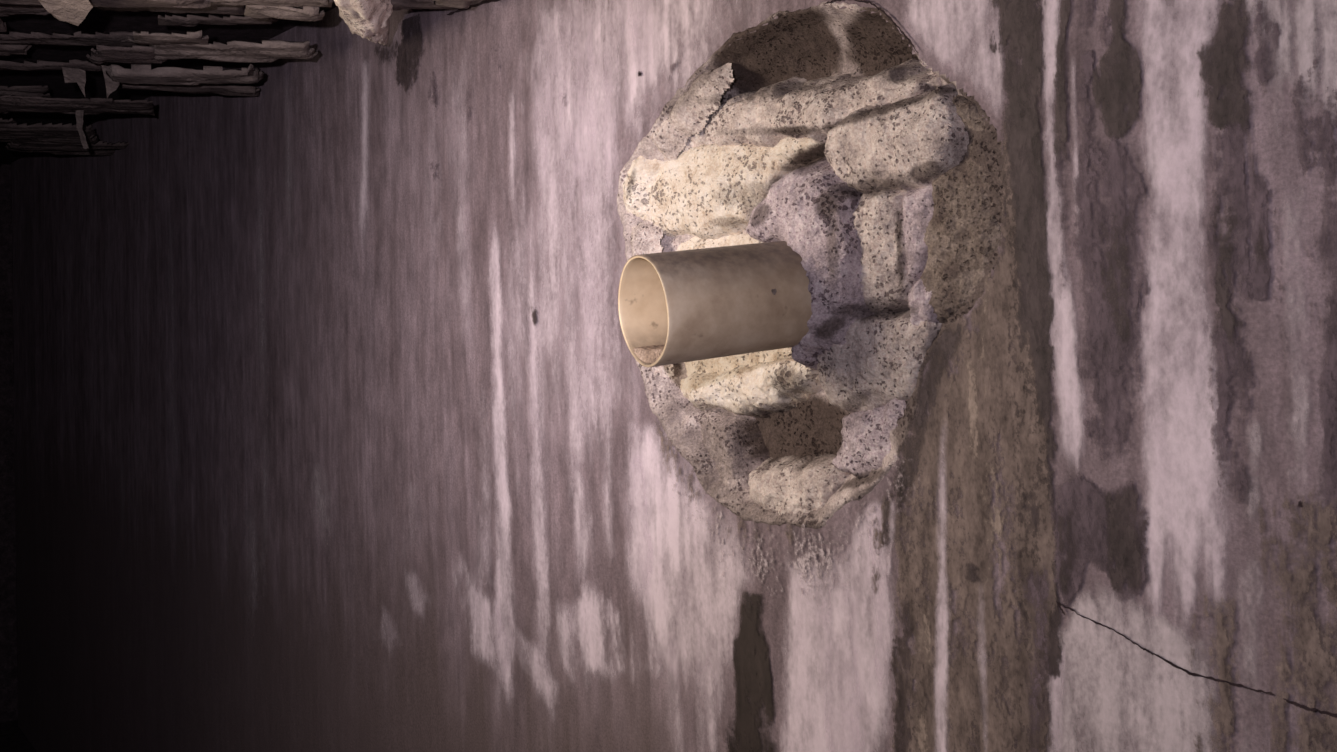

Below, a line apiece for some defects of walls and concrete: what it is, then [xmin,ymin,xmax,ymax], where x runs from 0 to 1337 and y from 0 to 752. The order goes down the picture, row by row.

peeling [38,0,93,26]
peeling [62,67,89,149]
peeling [101,65,119,99]
damp [629,0,1337,752]
crack [1056,601,1337,718]